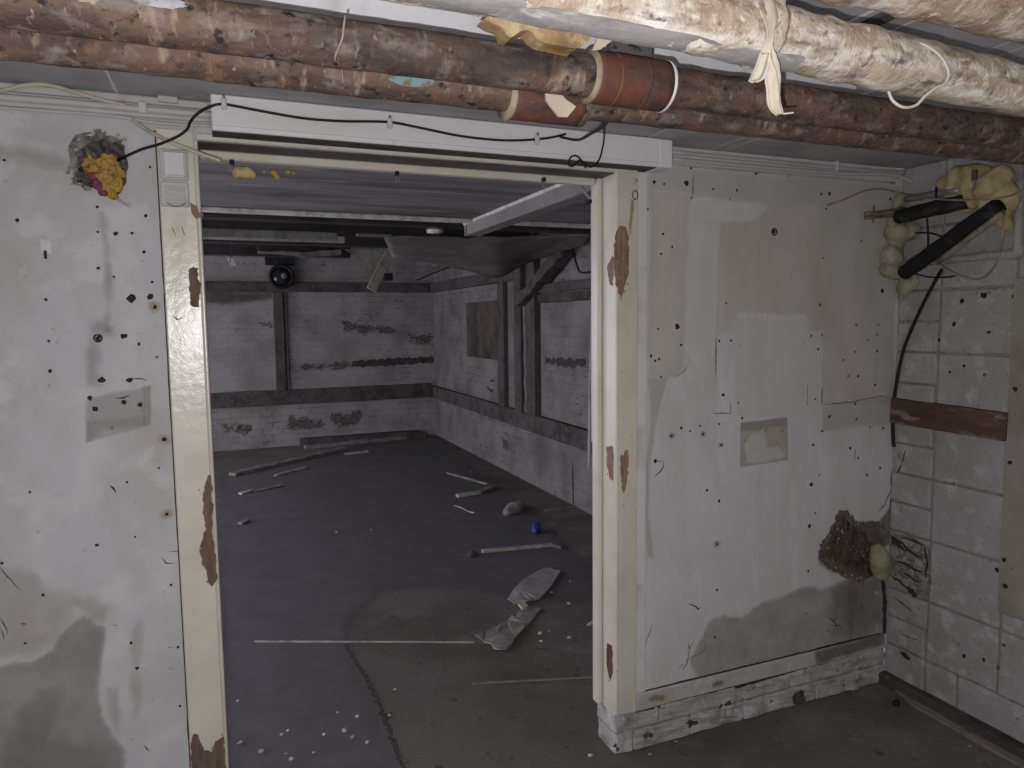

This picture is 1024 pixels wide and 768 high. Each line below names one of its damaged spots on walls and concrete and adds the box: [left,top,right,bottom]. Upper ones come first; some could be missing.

spalling [65,128,128,194]
peeling [607,226,630,298]
peeling [606,446,629,493]
peeling [198,474,218,586]
spalling [818,500,932,601]
leakage [0,557,145,768]
leakage [688,569,889,677]
peeling [190,733,226,768]